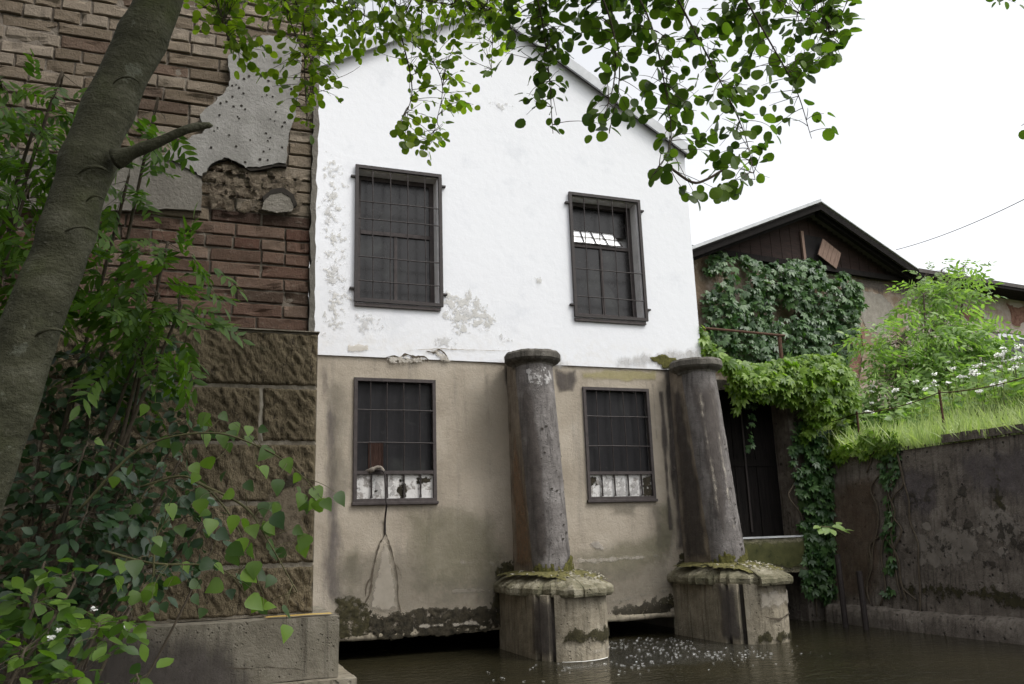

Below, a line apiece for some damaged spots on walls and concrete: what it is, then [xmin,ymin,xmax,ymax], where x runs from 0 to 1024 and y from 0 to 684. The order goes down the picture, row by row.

spalling [207,158,303,215]
peeling [317,151,384,336]
peeling [383,289,512,363]
peeling [526,367,552,391]